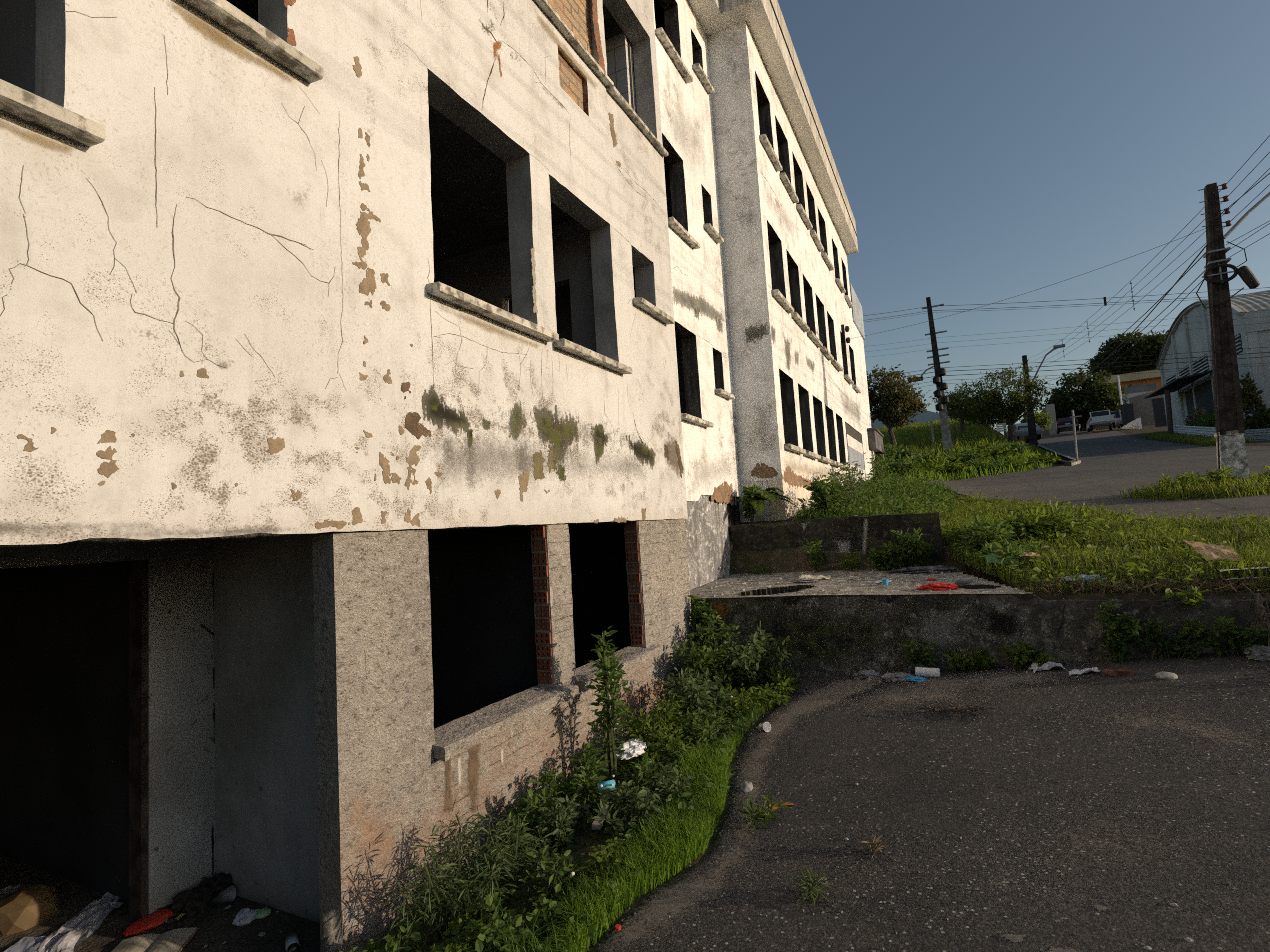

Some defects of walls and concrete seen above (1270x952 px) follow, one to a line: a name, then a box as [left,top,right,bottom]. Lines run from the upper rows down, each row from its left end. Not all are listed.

crack [482,1,571,169]
crack [87,36,347,391]
peeling [352,128,391,311]
crack [0,165,103,341]
peeling [17,434,39,452]
peeling [97,430,119,485]
peeling [374,369,443,494]
peeling [404,508,420,527]
damp [467,419,491,448]
damp [665,443,681,474]
spalling [711,481,734,506]
spalling [750,462,819,489]